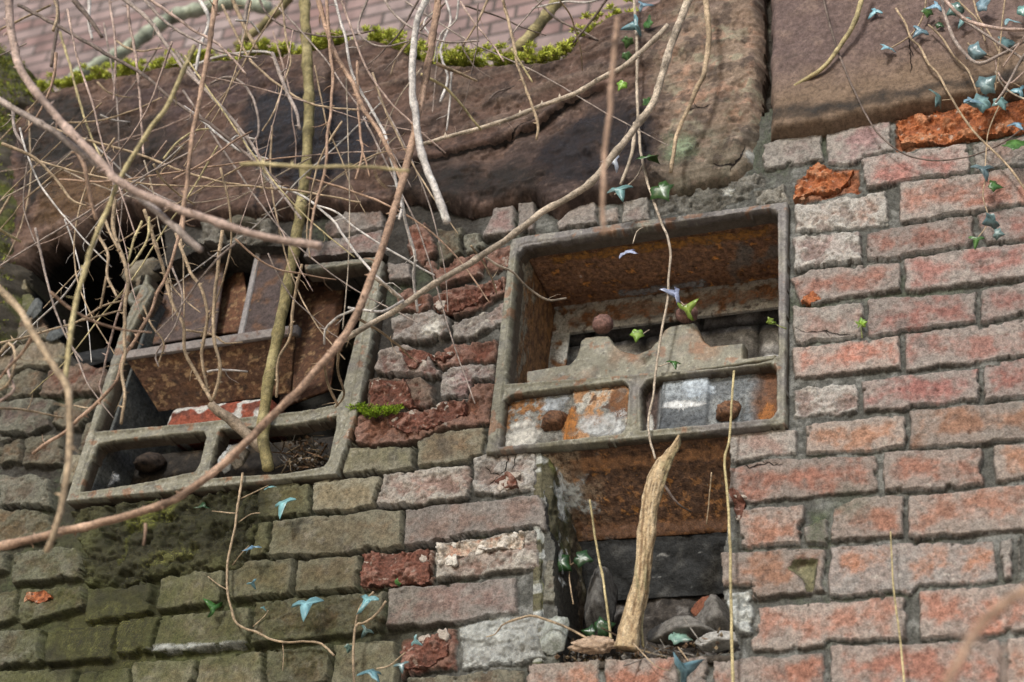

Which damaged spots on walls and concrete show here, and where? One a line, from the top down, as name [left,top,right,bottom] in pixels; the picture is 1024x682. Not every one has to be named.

spalling [896,97,1024,151]
spalling [793,162,854,205]
rust [552,227,768,264]
rust [568,283,779,327]
spalling [368,348,469,435]
leakage [46,490,263,672]
spalling [360,530,525,591]
spalling [400,628,451,671]